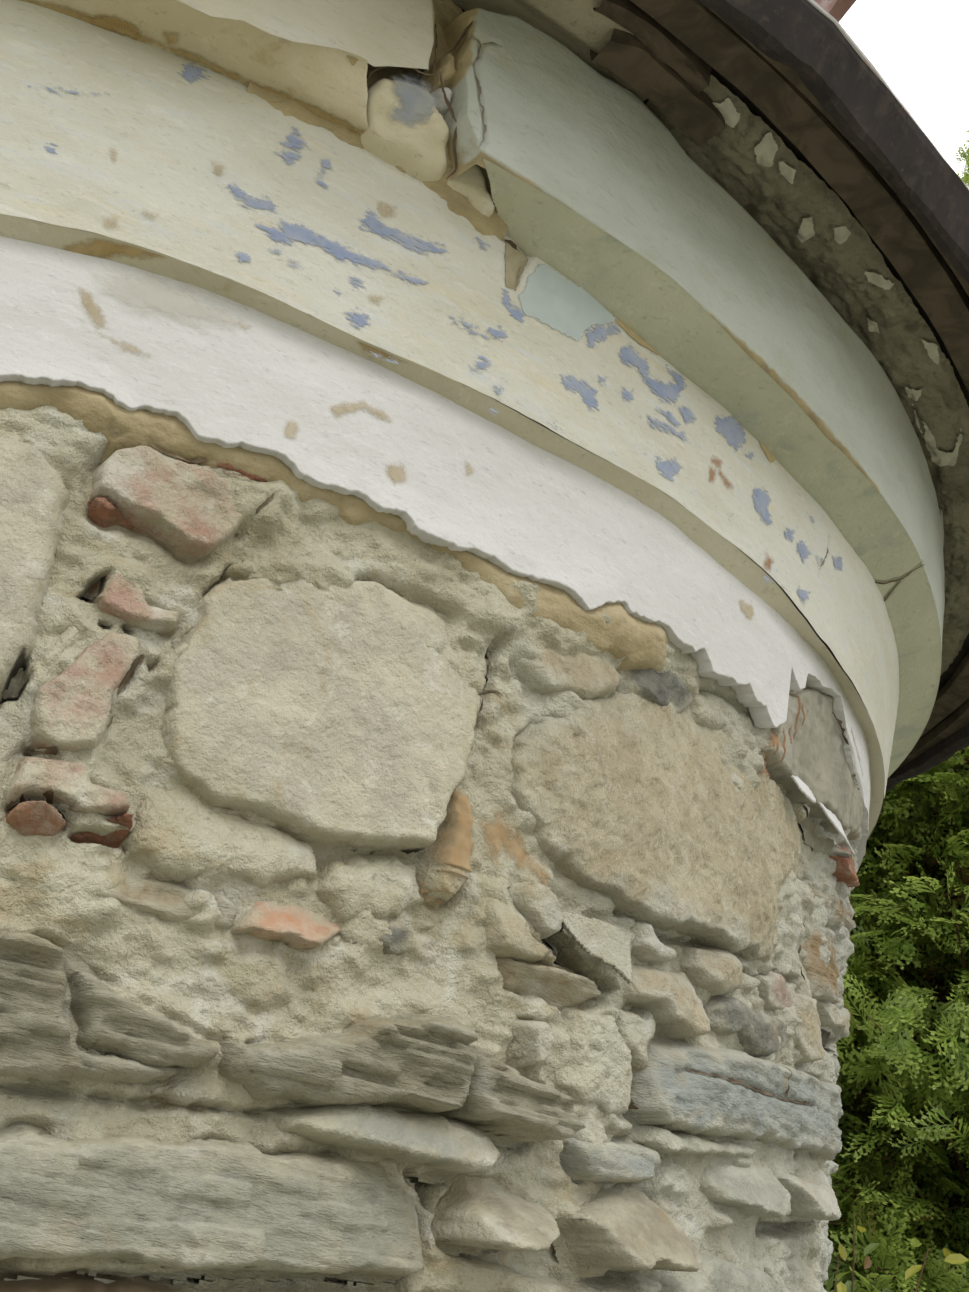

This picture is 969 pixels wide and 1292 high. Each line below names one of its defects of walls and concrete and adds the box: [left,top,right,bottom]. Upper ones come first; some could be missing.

crack [367,21,498,179]
peeling [713,98,741,128]
peeling [754,133,796,184]
peeling [227,183,429,296]
peeling [358,208,446,254]
spalling [450,237,538,341]
peeling [796,217,815,243]
peeling [560,374,606,411]
peeling [586,319,697,441]
spalling [0,381,669,672]
peeling [752,488,843,571]
peeling [761,688,863,857]